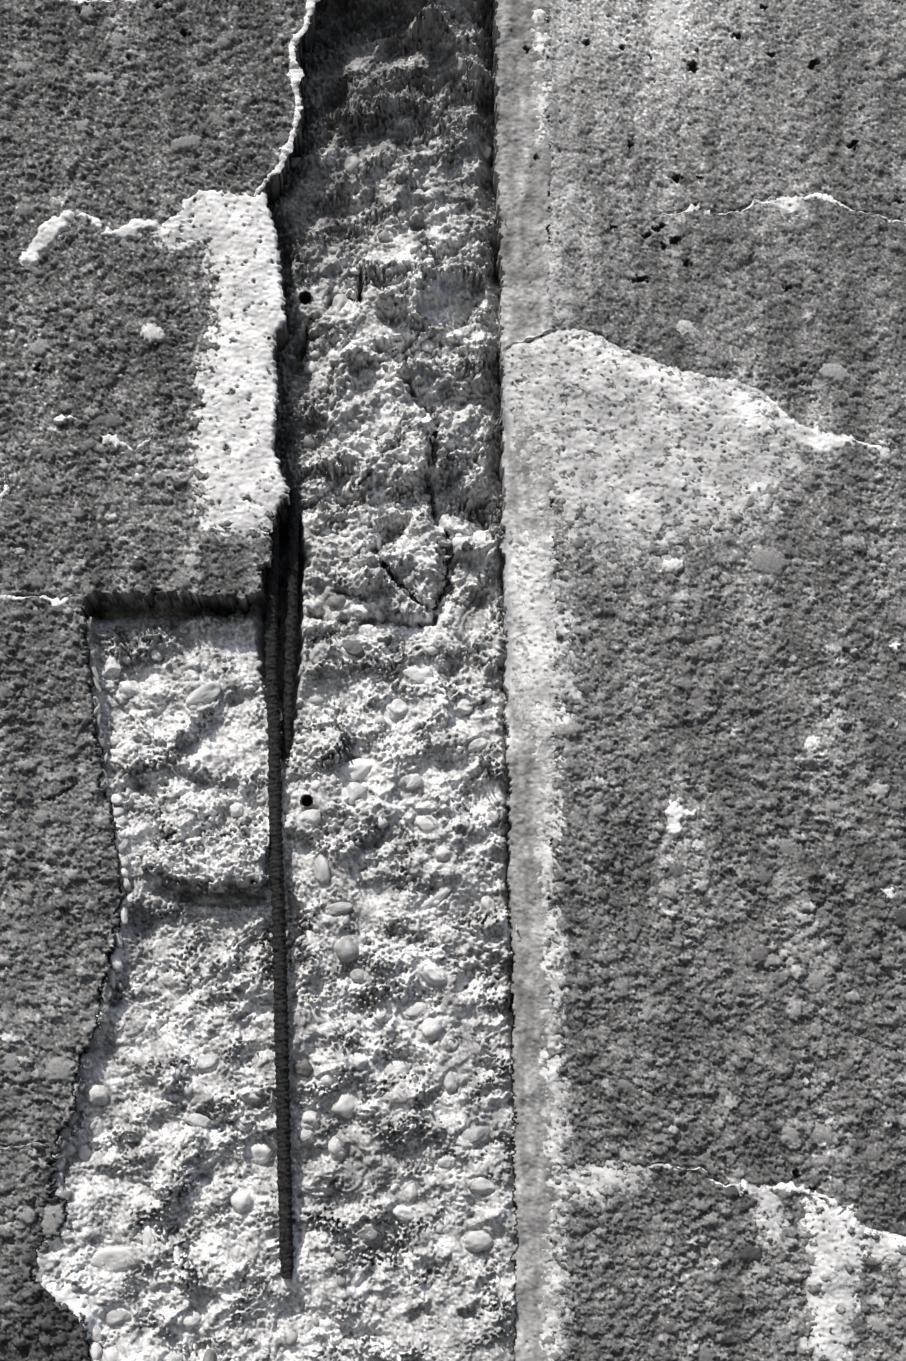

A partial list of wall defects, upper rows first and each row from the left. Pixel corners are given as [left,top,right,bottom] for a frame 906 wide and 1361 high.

crack [60,0,137,8]
crack [655,192,906,224]
crack [0,594,82,606]
spalling [31,0,519,1361]
crack [0,1140,54,1150]